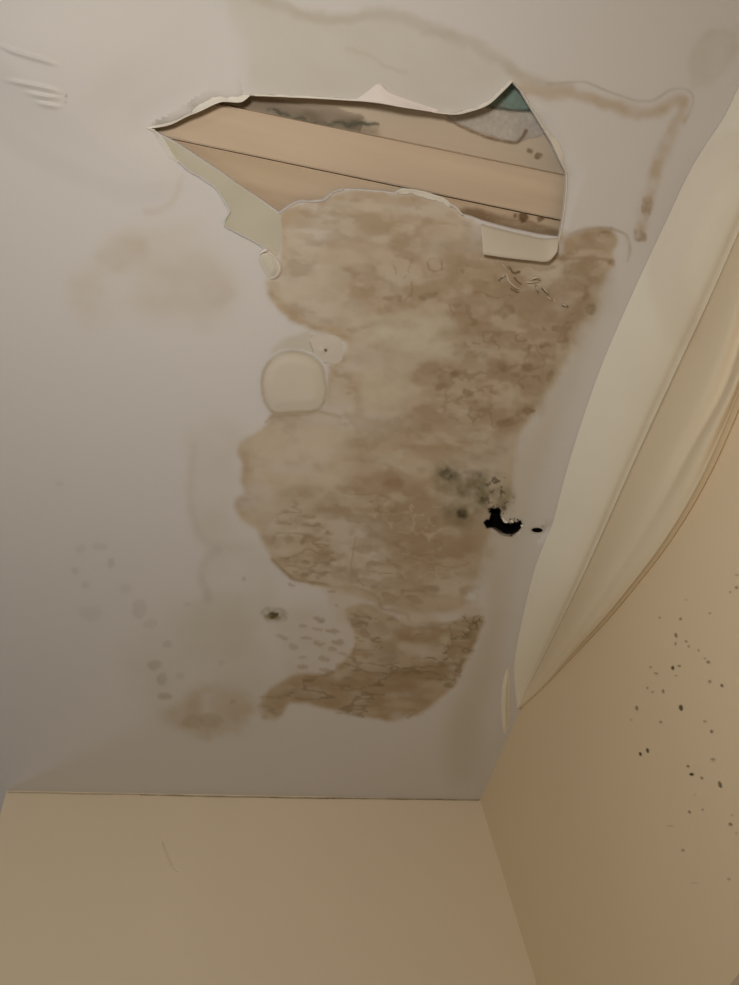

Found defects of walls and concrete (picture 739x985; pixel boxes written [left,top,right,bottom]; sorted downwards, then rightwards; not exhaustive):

flaking render [162,137,282,279]
damp [58,0,739,794]